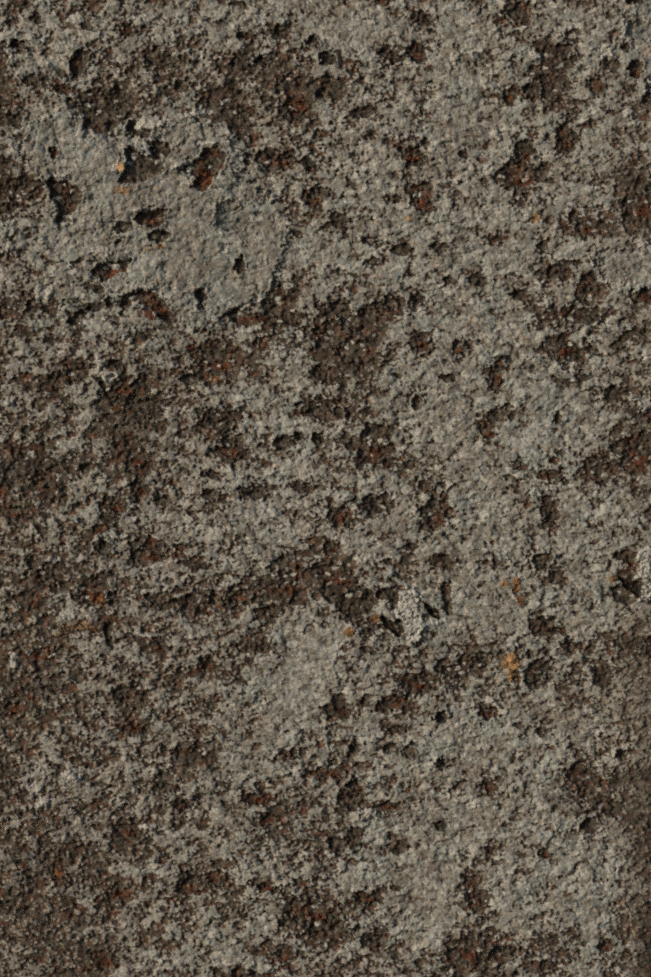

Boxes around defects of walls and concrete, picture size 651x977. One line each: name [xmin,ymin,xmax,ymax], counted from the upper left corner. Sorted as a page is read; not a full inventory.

corrosion [21,73,132,133]
corrosion [195,49,348,136]
corrosion [111,140,171,195]
corrosion [180,145,227,191]
corrosion [386,180,441,220]
corrosion [91,258,133,283]
corrosion [117,290,178,323]
corrosion [543,259,599,366]
corrosion [36,357,174,516]
corrosion [345,422,396,478]
corrosion [327,492,395,528]
corrosion [319,613,564,722]